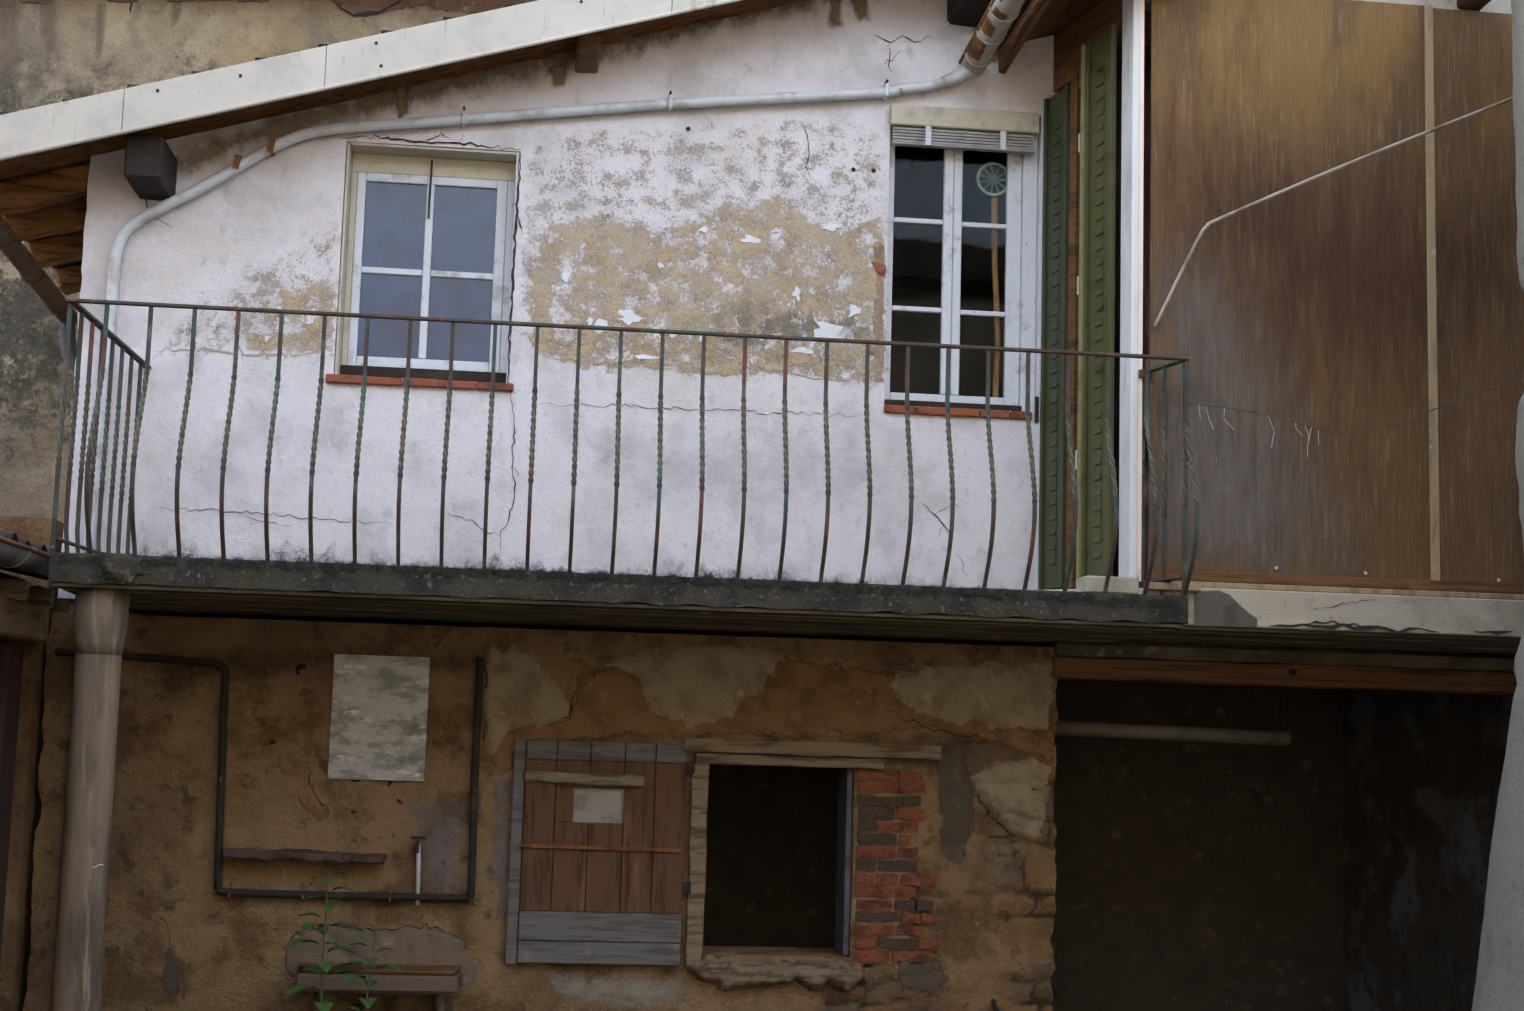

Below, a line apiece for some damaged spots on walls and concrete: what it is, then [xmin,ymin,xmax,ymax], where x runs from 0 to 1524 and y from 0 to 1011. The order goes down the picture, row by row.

peeling [170,238,338,353]
peeling [523,123,886,388]
crack [149,507,389,526]